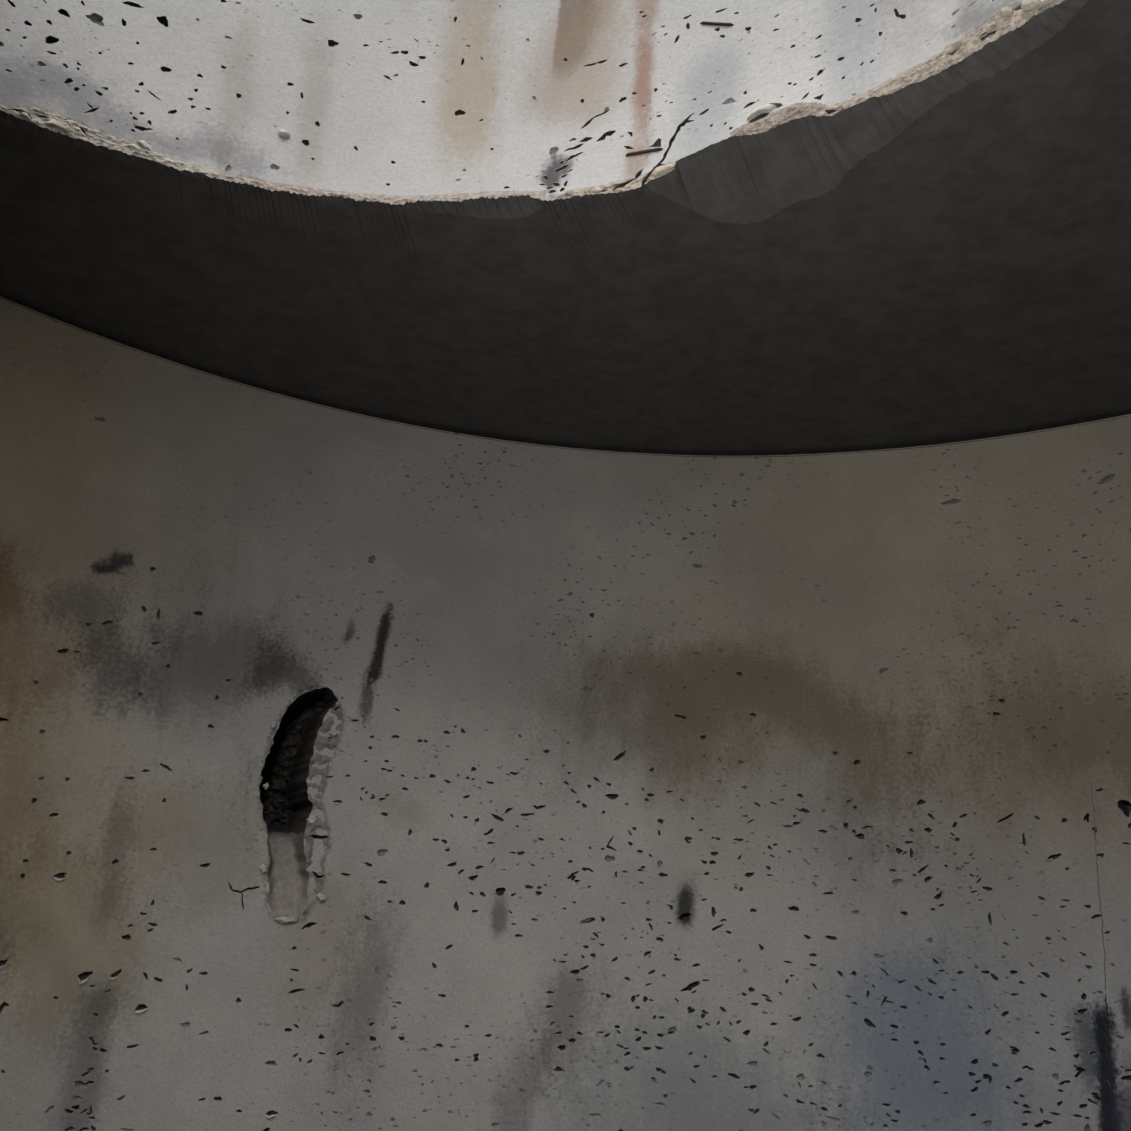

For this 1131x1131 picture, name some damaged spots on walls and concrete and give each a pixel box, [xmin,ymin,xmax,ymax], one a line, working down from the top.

spalling [693,0,1064,136]
spalling [0,103,676,205]
crack [560,109,694,192]
leakage [368,604,392,684]
spalling [259,685,344,924]
leakage [1093,992,1130,1131]